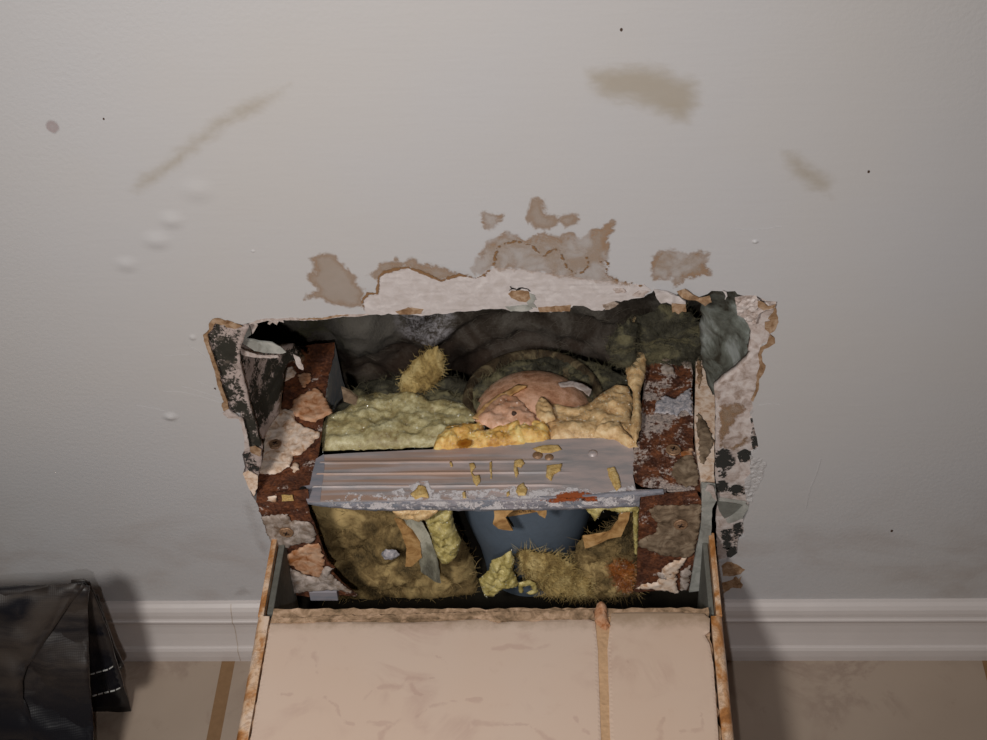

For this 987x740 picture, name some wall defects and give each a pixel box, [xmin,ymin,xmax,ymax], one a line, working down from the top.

peeling [363,268,712,316]
peeling [735,295,777,325]
peeling [224,320,304,370]
rust [655,388,693,416]
spalling [319,447,375,457]
leakage [715,418,758,496]
spalling [297,510,698,610]
spalling [711,443,745,593]
leakage [720,522,743,558]